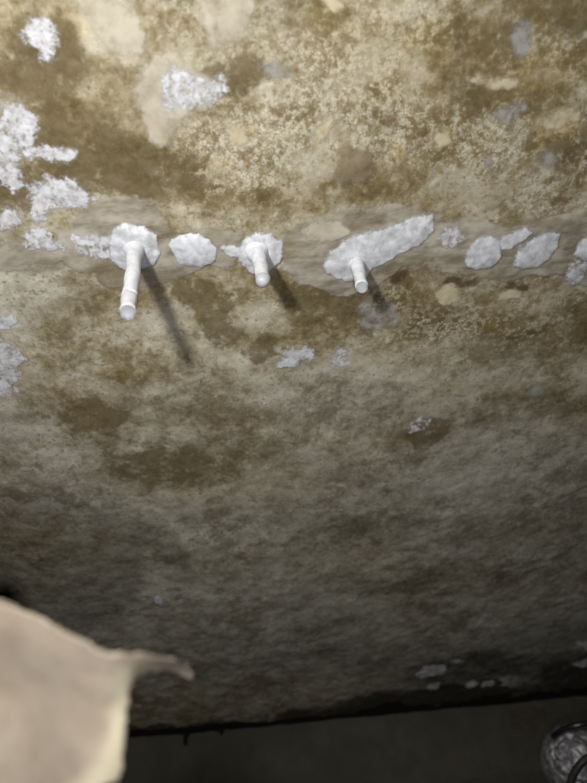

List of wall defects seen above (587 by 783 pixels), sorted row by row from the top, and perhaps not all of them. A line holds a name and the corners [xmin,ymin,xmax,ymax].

damp [161,56,263,115]
damp [0,8,245,345]
damp [0,315,28,397]
damp [241,333,315,370]
damp [572,641,587,668]
damp [416,659,464,690]
damp [465,677,520,688]